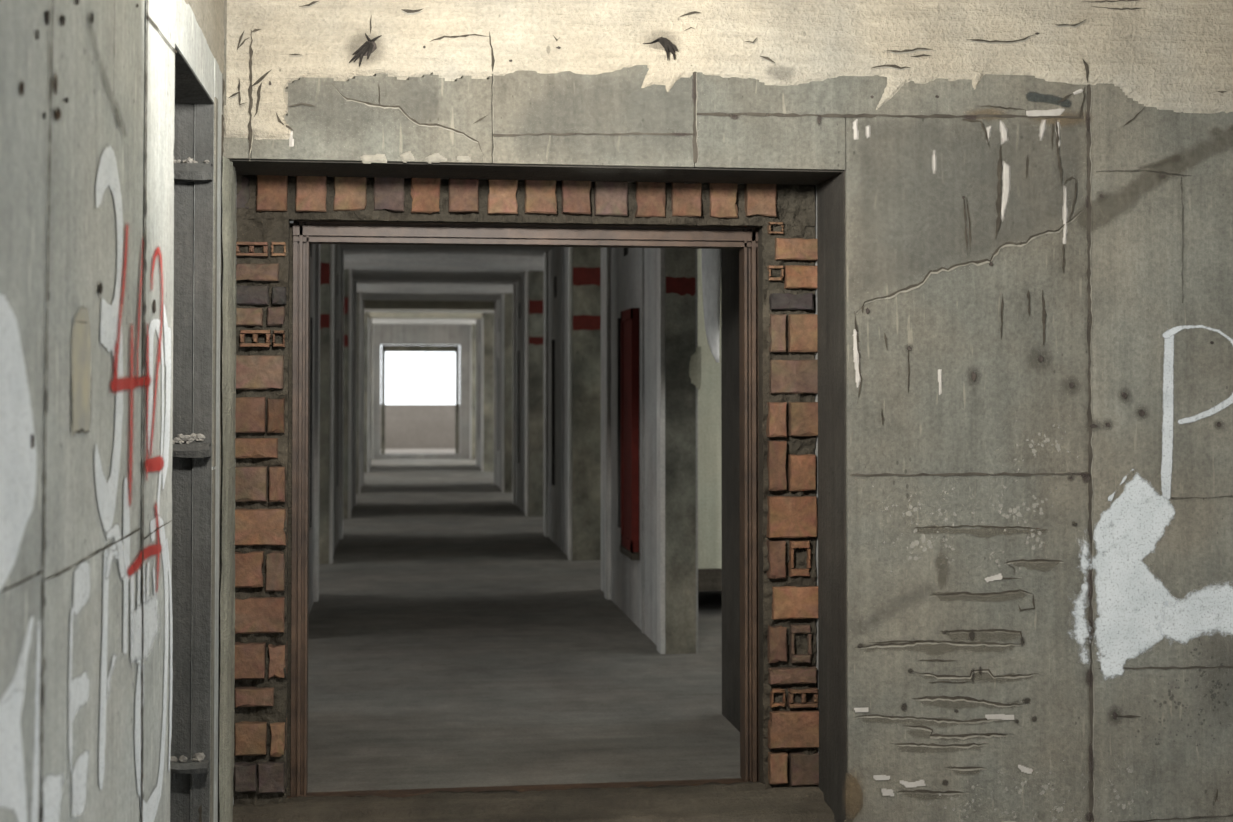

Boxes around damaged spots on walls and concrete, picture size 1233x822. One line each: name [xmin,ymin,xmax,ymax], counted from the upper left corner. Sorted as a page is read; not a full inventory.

crack [872,48,935,70]
crack [966,0,1140,44]
crack [1082,60,1090,83]
peeling [182,0,1233,347]
crack [859,210,1082,313]
peeling [689,249,721,389]
spalling [853,308,870,403]
spalling [931,559,1063,611]
spalling [1090,356,1110,822]
spalling [854,629,1039,748]
spalling [844,773,863,822]
spalling [873,767,987,796]